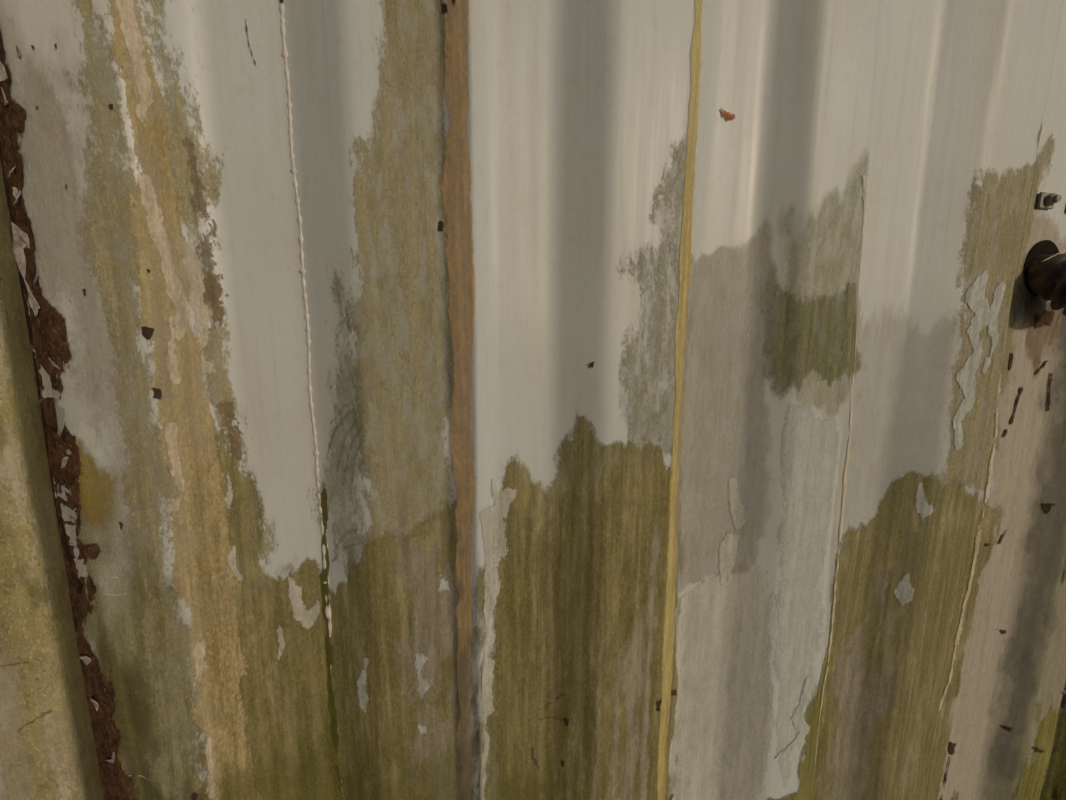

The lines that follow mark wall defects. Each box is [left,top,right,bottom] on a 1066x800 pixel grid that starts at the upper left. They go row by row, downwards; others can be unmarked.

peeling [0,62,8,106]
peeling [8,166,21,204]
peeling [11,222,40,316]
peeling [0,291,64,614]
corrosion [18,272,113,663]
corrosion [141,326,154,339]
water stain [398,0,476,800]
water stain [612,0,839,800]
peeling [719,477,746,586]
peeling [34,631,86,800]
peeling [776,678,811,759]
water stain [829,628,885,800]